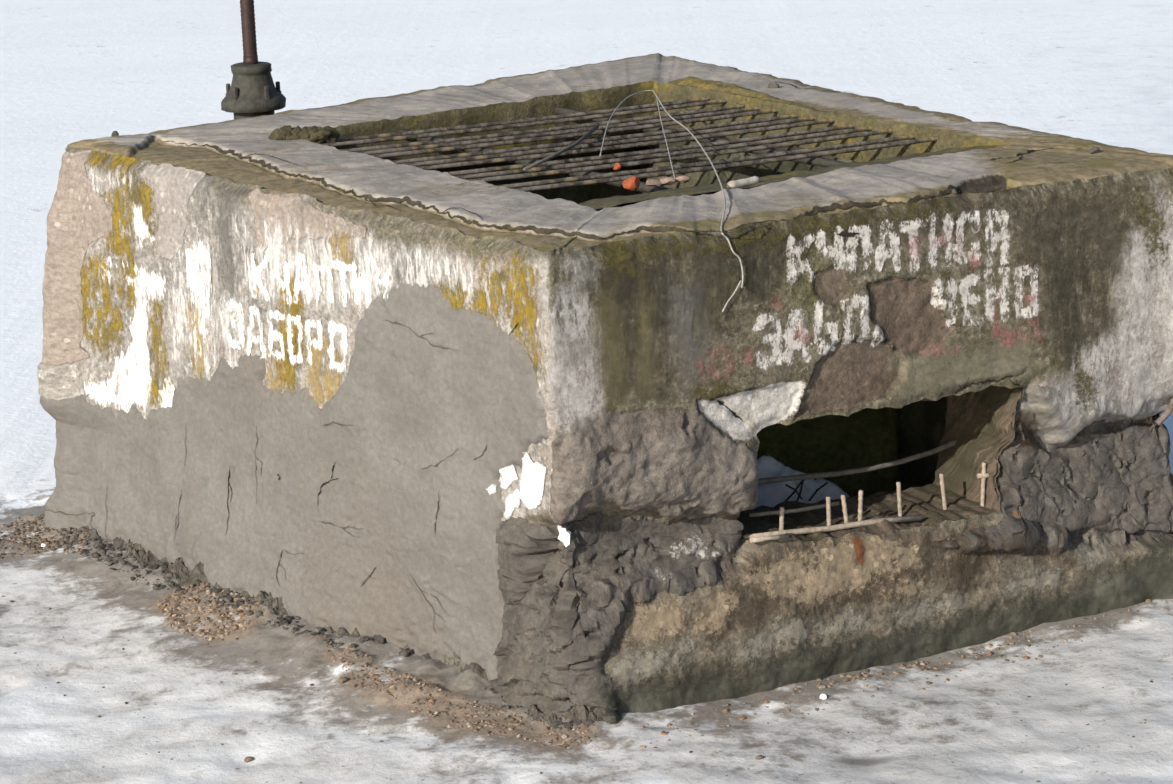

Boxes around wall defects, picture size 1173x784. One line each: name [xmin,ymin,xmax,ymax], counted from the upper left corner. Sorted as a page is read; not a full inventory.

spalling [40,150,496,417]
leakage [538,258,656,430]
leakage [1052,194,1173,430]
crack [226,426,280,532]
crack [317,463,363,538]
crack [422,445,487,533]
peeling [486,452,546,518]
peeling [557,525,571,547]
rust [705,531,1071,640]